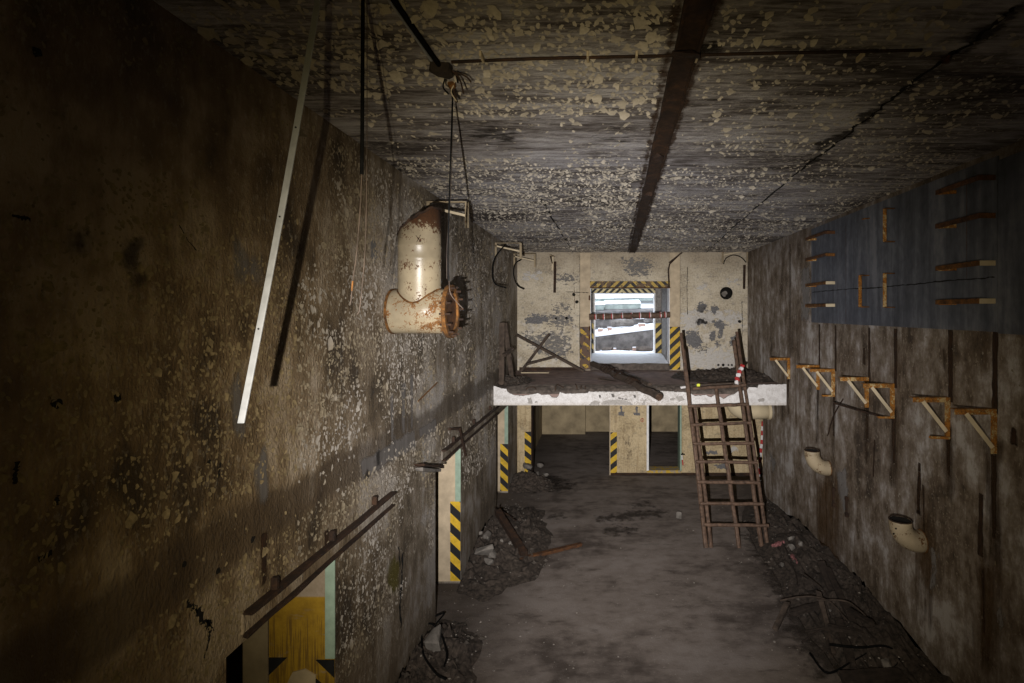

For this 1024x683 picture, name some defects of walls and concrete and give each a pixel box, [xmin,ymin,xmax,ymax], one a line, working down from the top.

peeling [178,0,1024,485]
crack [707,2,1024,252]
peeling [297,390,510,680]